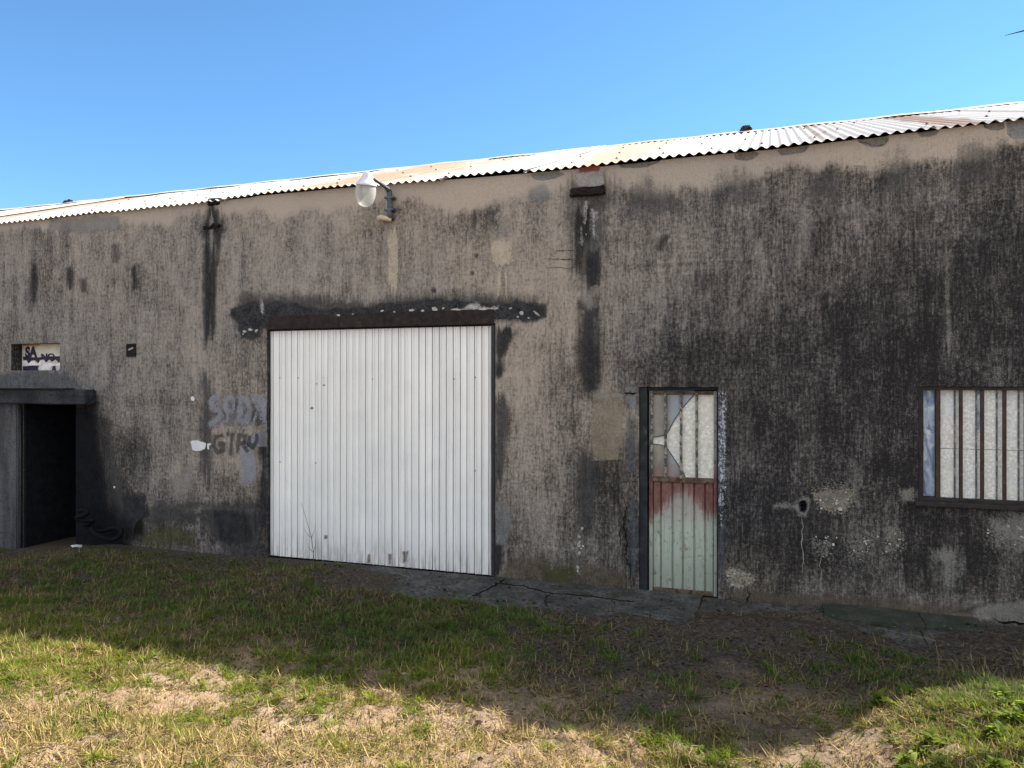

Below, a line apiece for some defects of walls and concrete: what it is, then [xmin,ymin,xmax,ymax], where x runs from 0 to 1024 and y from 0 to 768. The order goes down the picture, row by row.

leakage [202,206,224,345]
leakage [230,226,547,378]
leakage [570,181,610,395]
leakage [495,393,510,487]
flaking render [808,479,862,515]
crack [472,498,634,602]
flaking render [725,567,756,590]
crack [801,515,822,584]